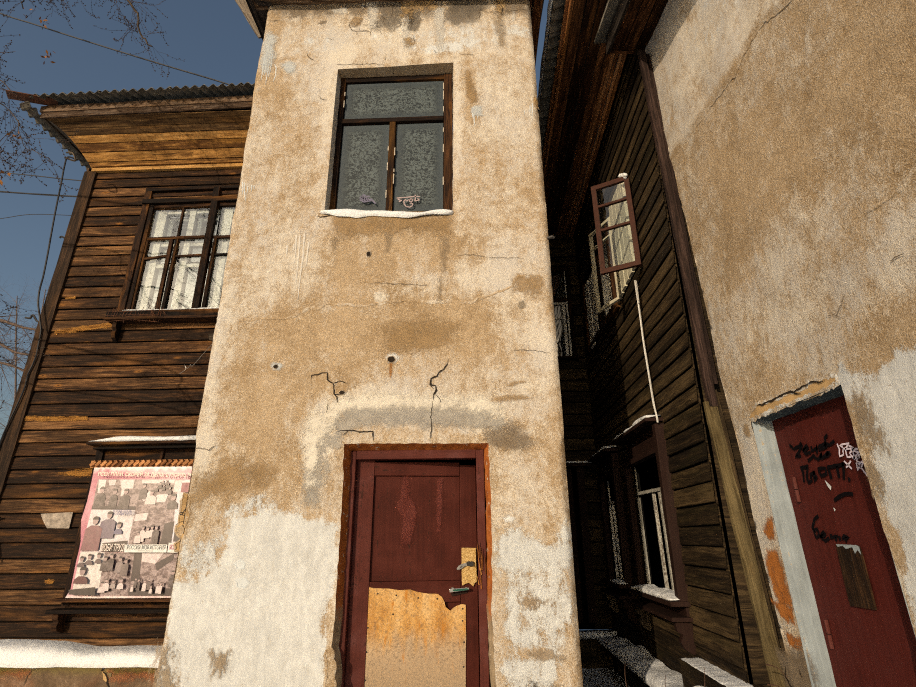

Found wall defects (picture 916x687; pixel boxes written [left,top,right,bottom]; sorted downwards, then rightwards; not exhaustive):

water stain [273,2,420,49]
water stain [432,0,484,51]
crack [311,372,347,412]
crack [429,362,448,438]
peeling [743,373,840,437]
water stain [299,380,531,488]
peeling [848,387,891,503]
spalling [173,492,192,553]
peeling [148,642,180,687]
peeling [208,648,231,678]
spalling [323,648,337,687]
peeling [527,648,566,662]